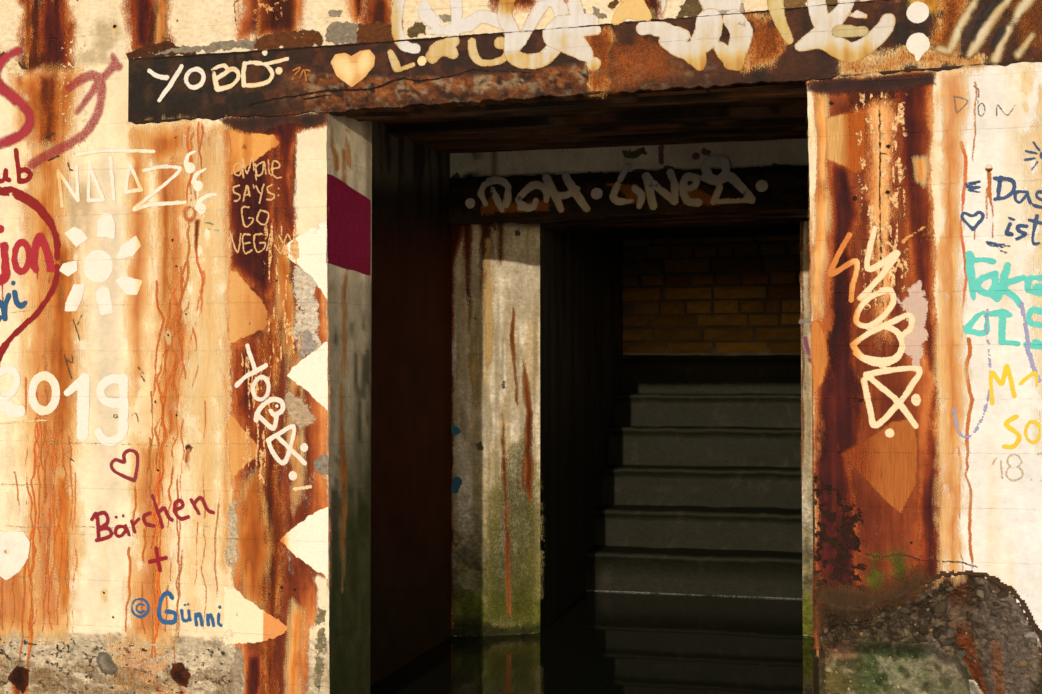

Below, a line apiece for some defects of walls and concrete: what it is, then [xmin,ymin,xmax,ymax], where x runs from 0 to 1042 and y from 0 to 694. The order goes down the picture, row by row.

rust [112,0,173,51]
rust [237,0,304,40]
rust [345,0,392,30]
rust [513,0,536,10]
rust [585,26,669,94]
rust [644,0,661,22]
rust [1023,70,1042,304]
rust [0,0,83,694]
rust [124,115,351,694]
rust [452,196,549,403]
rust [510,308,534,502]
rust [799,0,985,656]